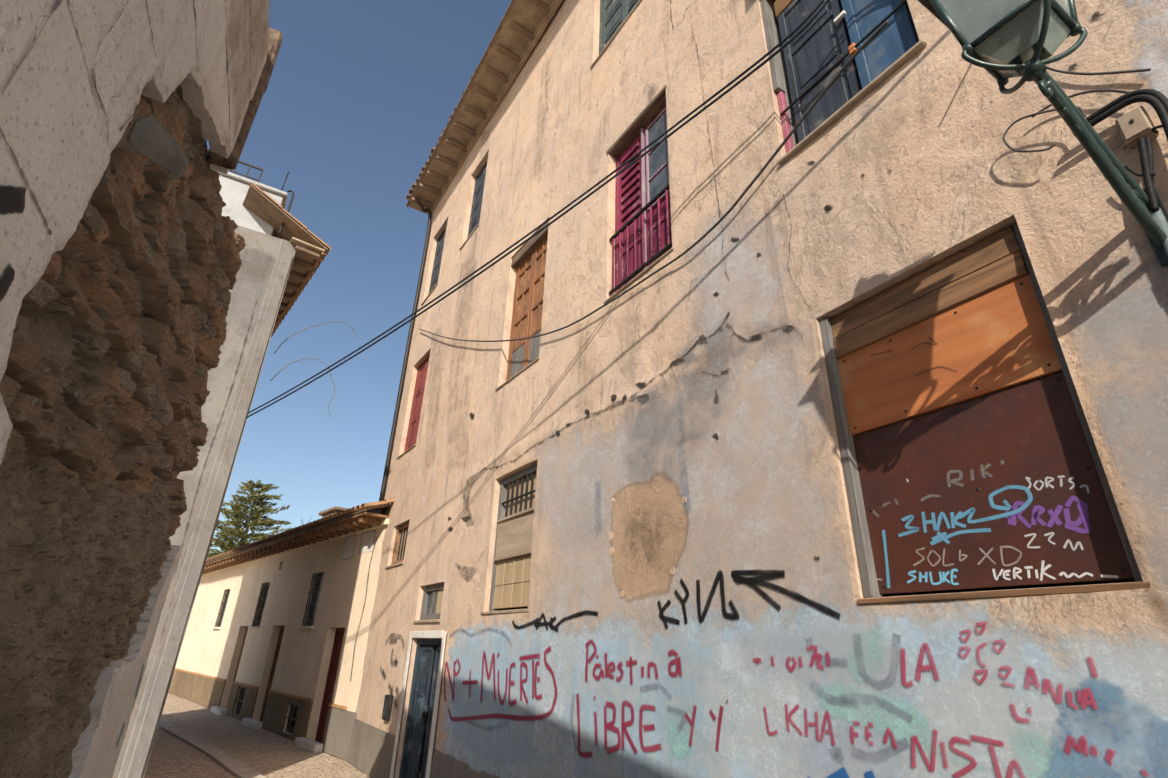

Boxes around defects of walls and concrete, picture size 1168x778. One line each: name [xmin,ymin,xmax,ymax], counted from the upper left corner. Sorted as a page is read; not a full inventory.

crack [668,0,740,303]
flaking render [611,382,649,404]
crack [474,194,814,479]
spalling [609,472,689,601]